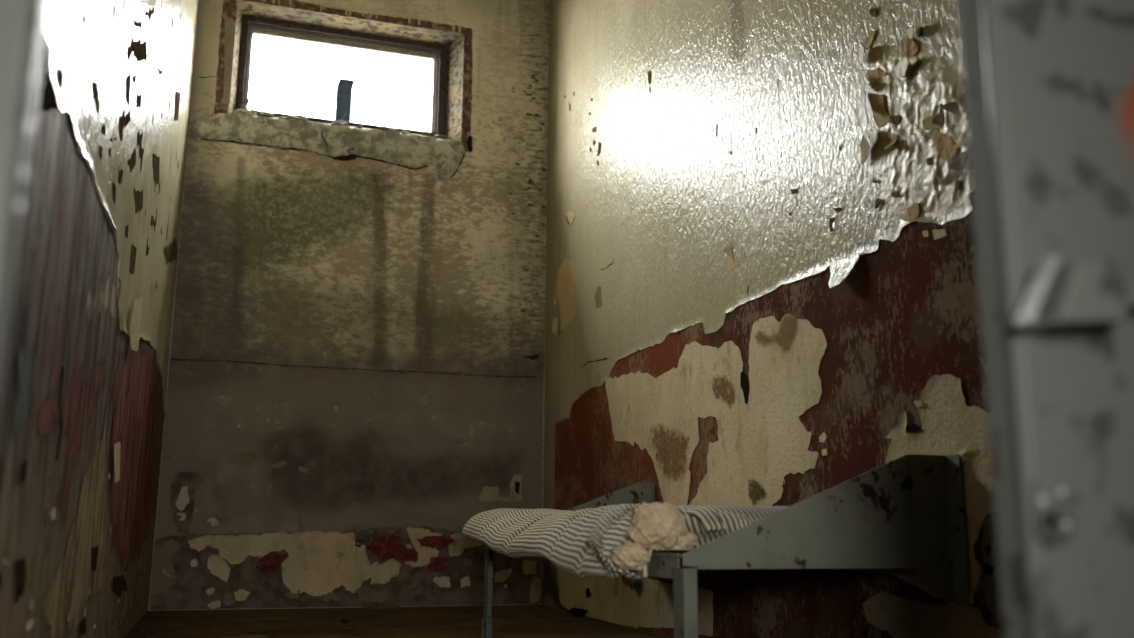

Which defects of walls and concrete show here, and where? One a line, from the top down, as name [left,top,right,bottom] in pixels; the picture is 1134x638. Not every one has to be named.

peeling [0,0,568,638]
damp [155,170,544,555]
peeling [552,180,988,510]
peeling [645,513,1003,638]